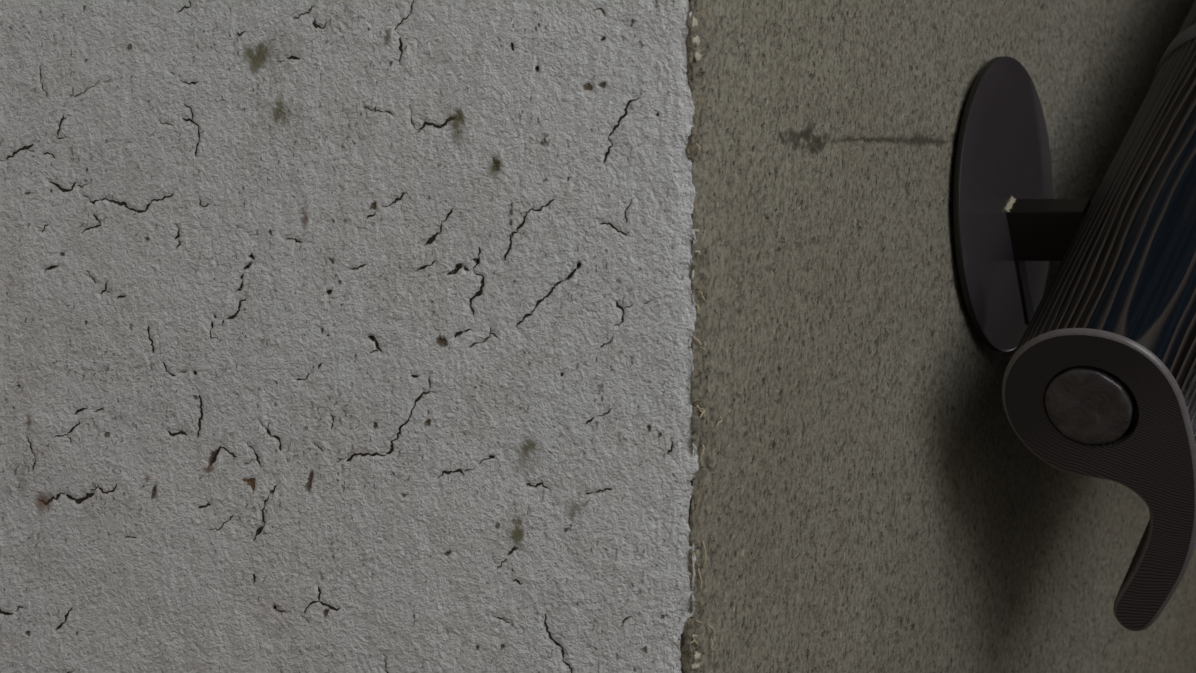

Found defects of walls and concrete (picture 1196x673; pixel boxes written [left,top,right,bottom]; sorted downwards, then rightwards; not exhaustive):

damp [246,44,267,70]
spalling [685,0,702,92]
crack [0,66,211,249]
crack [603,97,639,163]
spalling [685,127,700,164]
crack [417,199,579,347]
spalling [689,214,705,314]
crack [147,326,282,541]
crack [314,376,436,462]
spalling [690,336,722,456]
crack [42,484,117,505]
spalling [680,479,716,673]